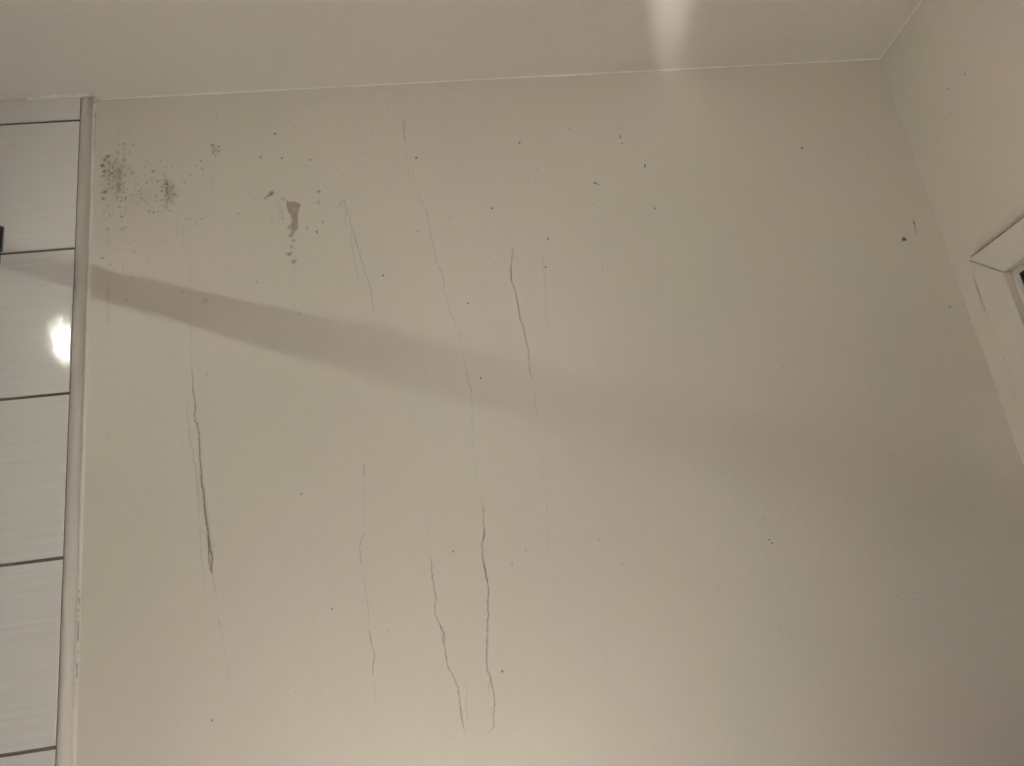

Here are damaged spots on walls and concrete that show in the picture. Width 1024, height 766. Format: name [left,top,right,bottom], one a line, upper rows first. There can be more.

crack [511,246,535,383]
crack [187,365,214,575]
crack [432,493,496,739]